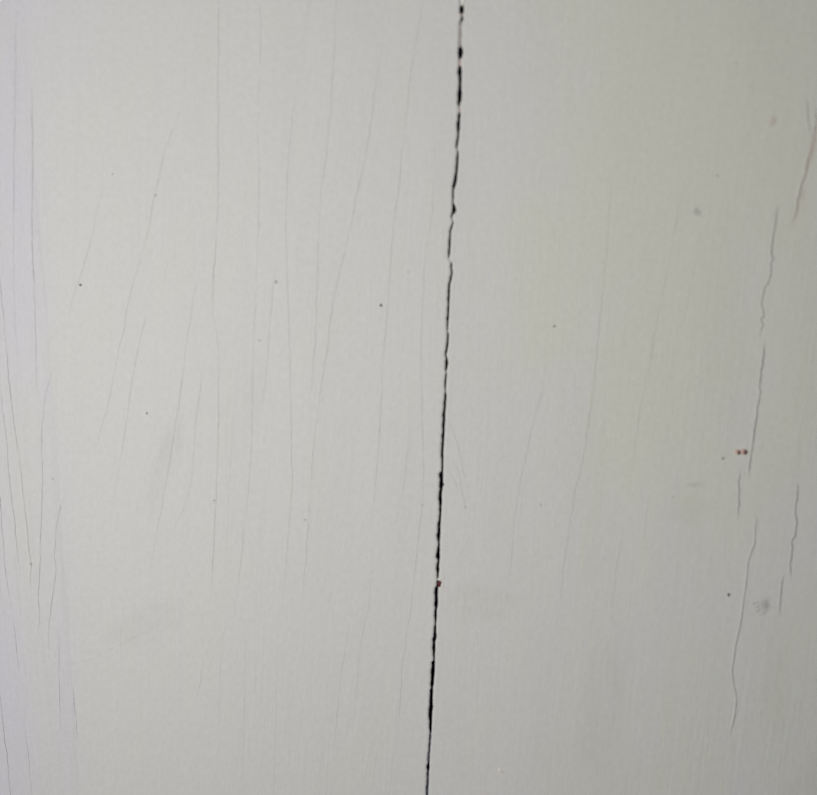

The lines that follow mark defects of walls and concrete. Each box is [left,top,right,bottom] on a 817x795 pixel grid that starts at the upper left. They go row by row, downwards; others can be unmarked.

crack [426,0,466,795]
crack [728,96,817,739]